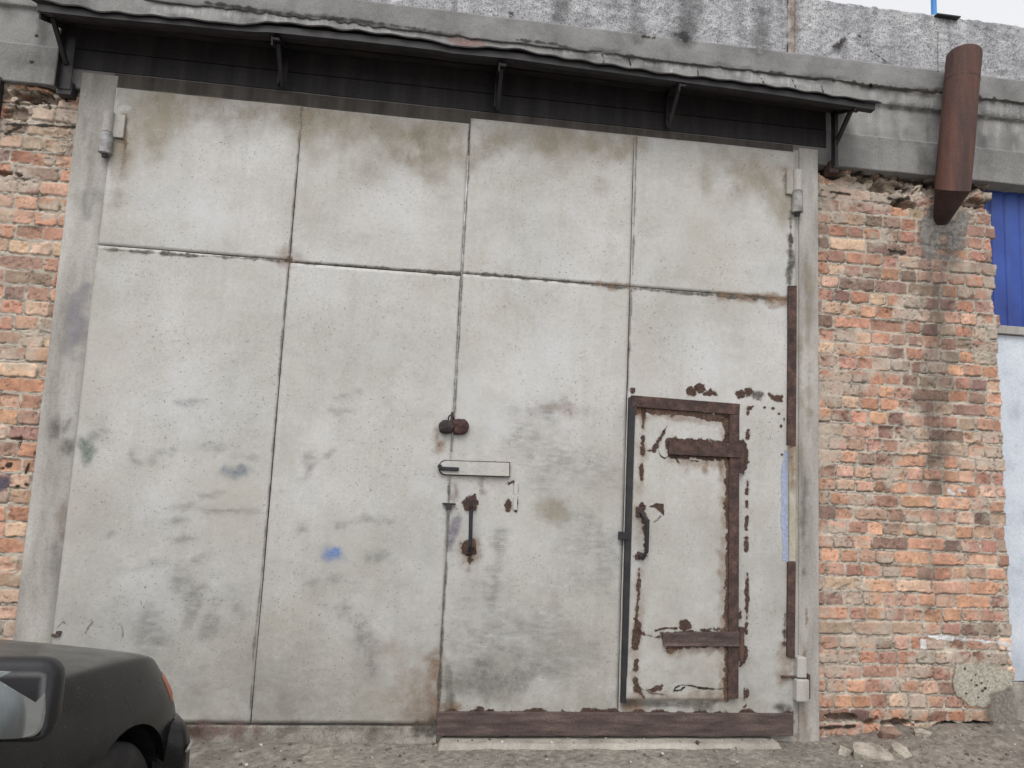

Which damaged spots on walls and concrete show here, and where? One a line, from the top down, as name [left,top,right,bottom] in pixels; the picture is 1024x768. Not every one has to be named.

water stain [144,92,181,144]
rust [665,436,729,472]
rust [449,521,477,564]
rust [654,619,727,654]
rust [580,699,756,713]